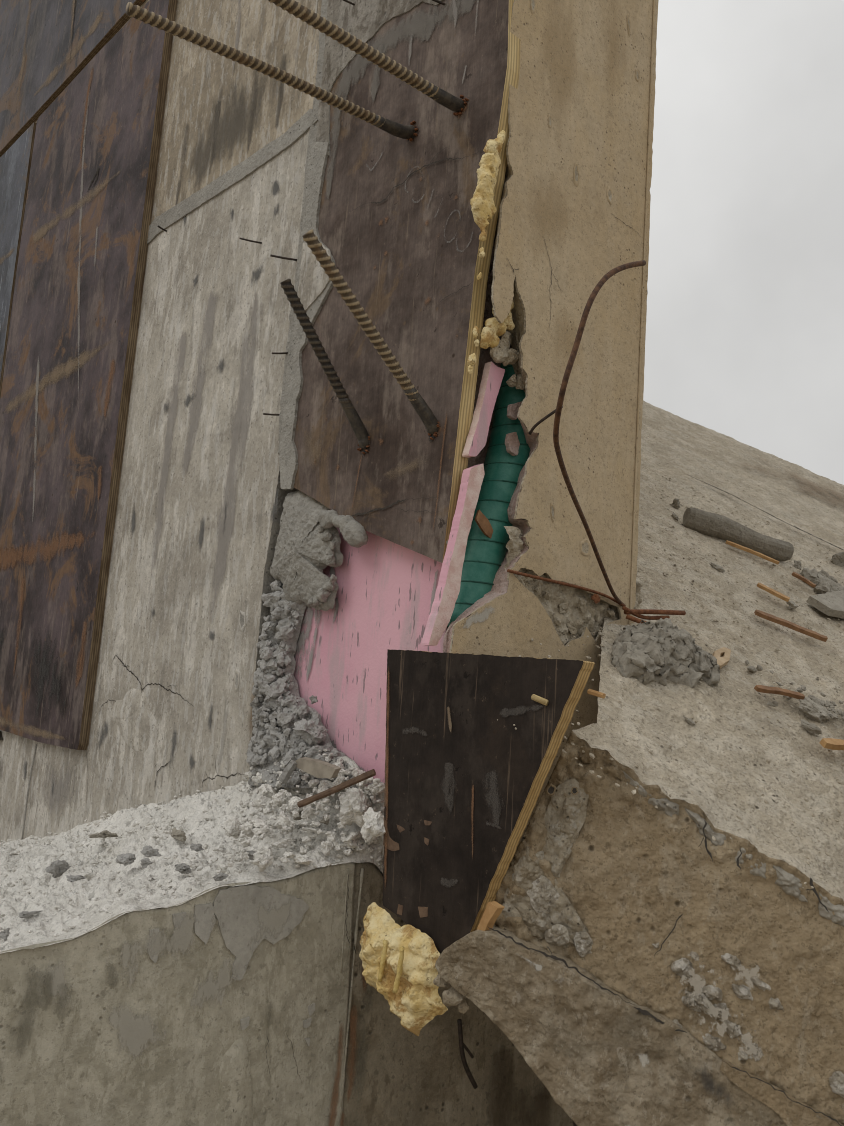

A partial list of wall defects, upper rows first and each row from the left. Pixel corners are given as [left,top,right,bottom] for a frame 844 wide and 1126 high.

peeling [270,142,343,611]
crack [111,656,193,706]
crack [654,914,683,956]
crack [488,927,687,1033]
spalling [671,951,784,1062]
crack [724,1061,843,1126]
spalling [829,1071,844,1098]